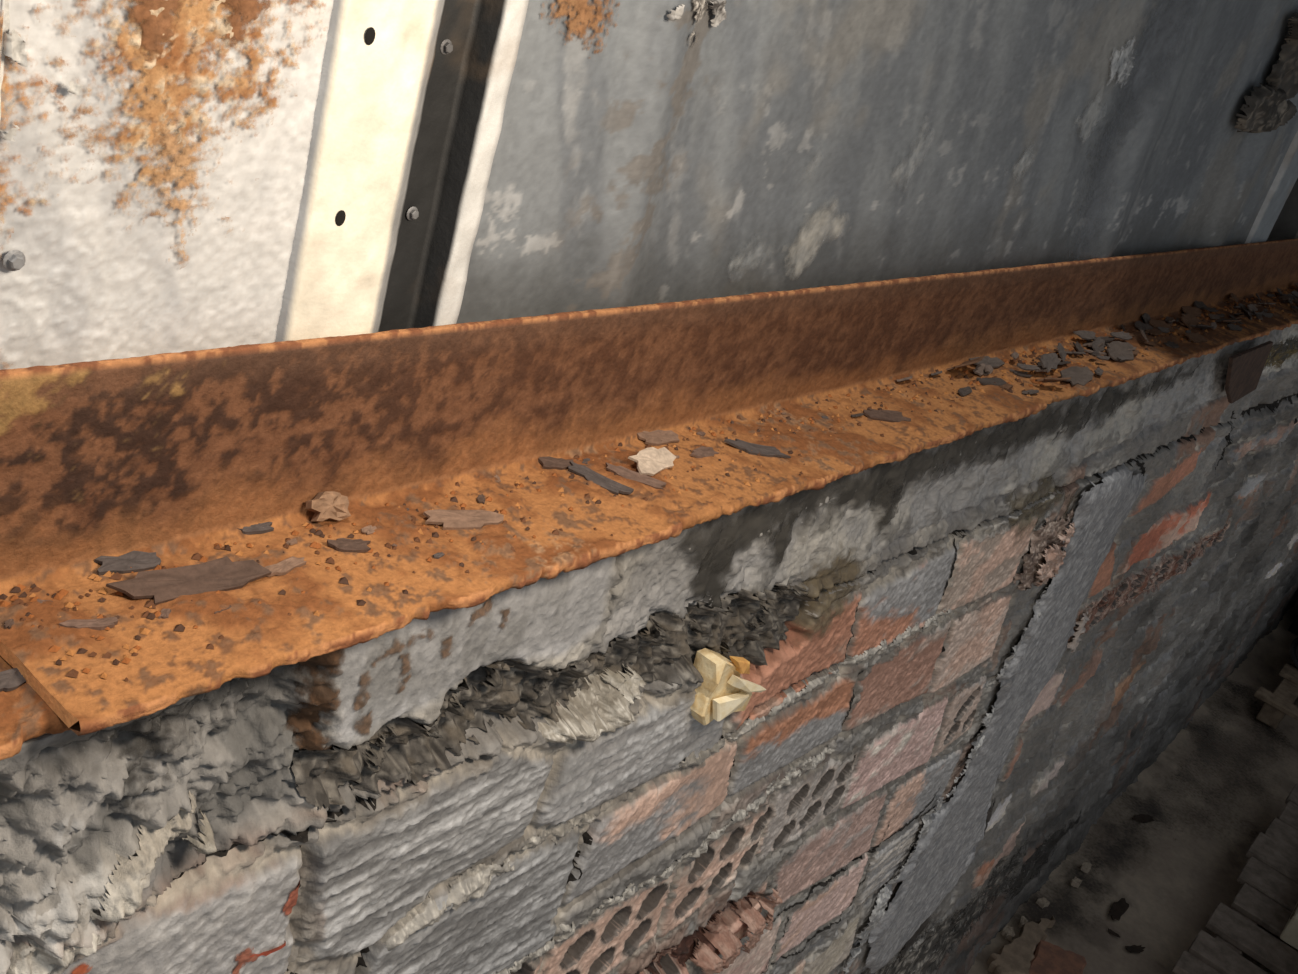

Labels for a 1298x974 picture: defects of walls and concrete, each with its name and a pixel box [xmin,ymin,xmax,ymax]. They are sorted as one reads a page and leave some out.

peeling [666,0,727,46]
corrosion [0,0,325,264]
corrosion [957,288,1298,397]
corrosion [306,491,351,522]
corrosion [327,525,377,553]
corrosion [538,456,666,495]
corrosion [637,421,791,459]
crack [1084,393,1298,478]
corrosion [286,630,452,751]
spalling [292,583,819,811]
peeling [72,964,92,974]
spalling [636,888,783,974]